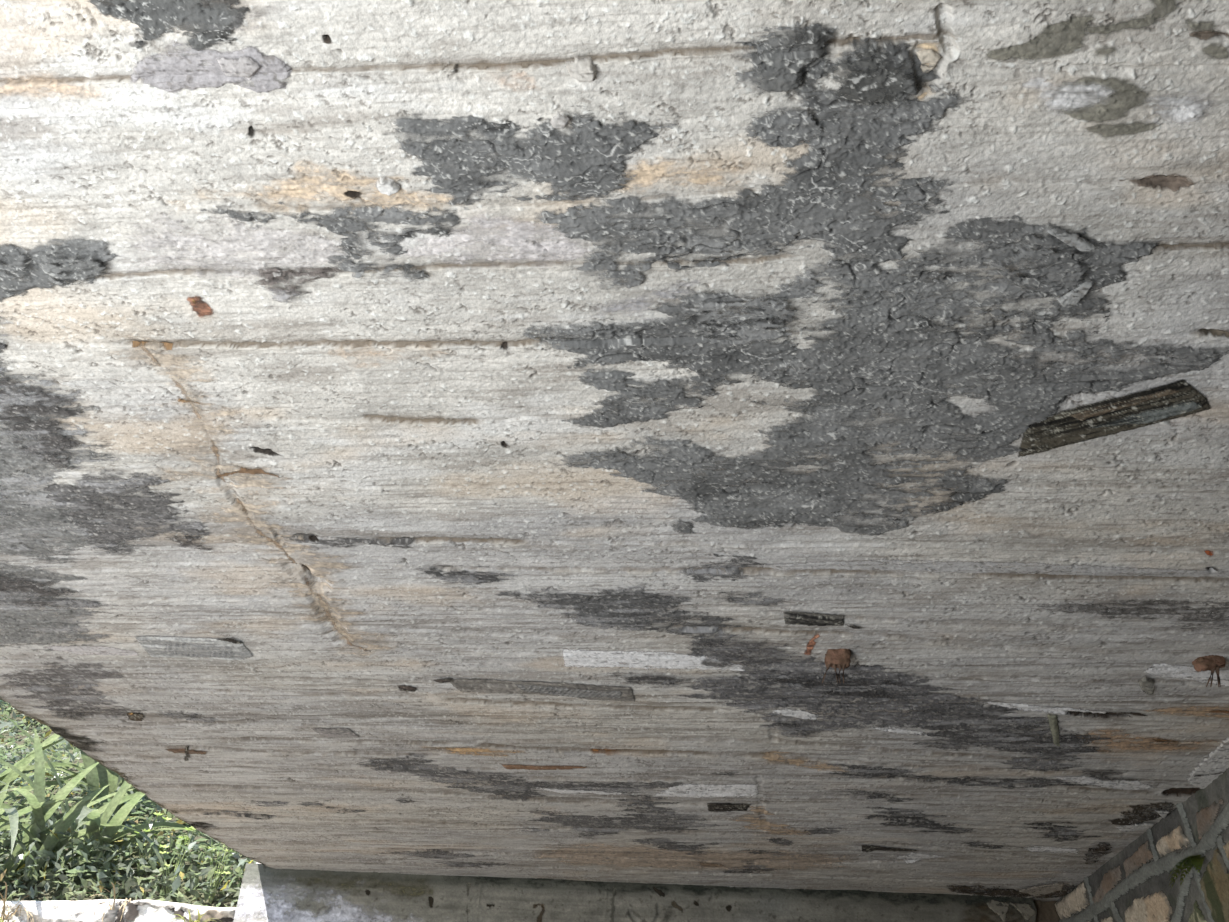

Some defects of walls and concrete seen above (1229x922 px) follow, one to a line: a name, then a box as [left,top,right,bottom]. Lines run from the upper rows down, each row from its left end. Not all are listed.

leakage [735,71,762,86]
leakage [745,108,822,148]
leakage [1023,77,1209,138]
leakage [136,225,346,277]
rust [187,296,212,317]
leakage [0,368,81,469]
crack [132,341,368,651]
leakage [0,575,98,608]
leakage [610,673,688,688]
leakage [694,639,925,700]